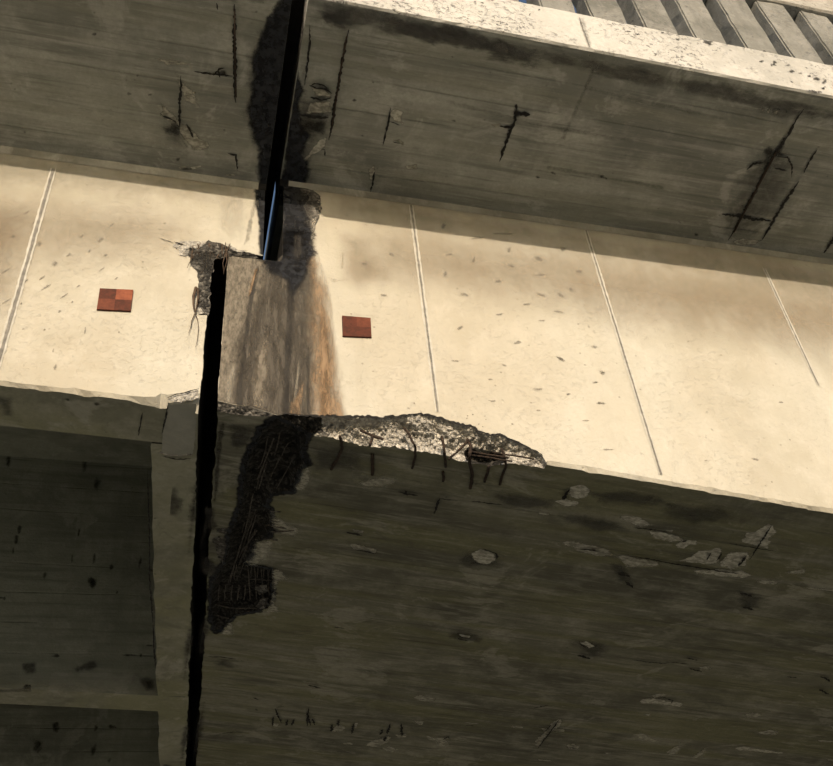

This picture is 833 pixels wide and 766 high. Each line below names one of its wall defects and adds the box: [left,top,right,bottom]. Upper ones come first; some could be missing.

crack [194,3,238,103]
spalling [160,185,322,315]
leakage [218,0,314,415]
crack [492,104,530,162]
corrosion [310,258,343,416]
crack [147,473,156,668]
spalling [206,413,546,634]
spalling [563,516,777,588]